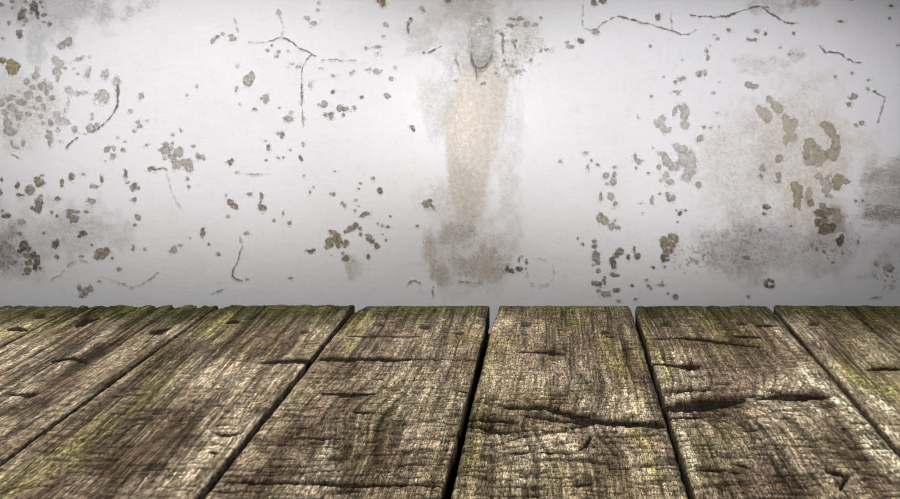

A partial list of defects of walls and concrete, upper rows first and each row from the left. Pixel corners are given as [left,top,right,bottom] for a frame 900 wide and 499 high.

crack [588,6,794,35]
peeling [0,35,123,149]
crack [66,84,120,149]
peeling [146,129,205,187]
crack [257,37,316,99]
water stain [437,61,506,219]
peeling [631,126,706,222]
peeling [755,96,851,253]
peeling [15,171,121,271]
peeling [306,211,391,261]
peeling [577,237,640,302]
peeling [652,233,678,269]